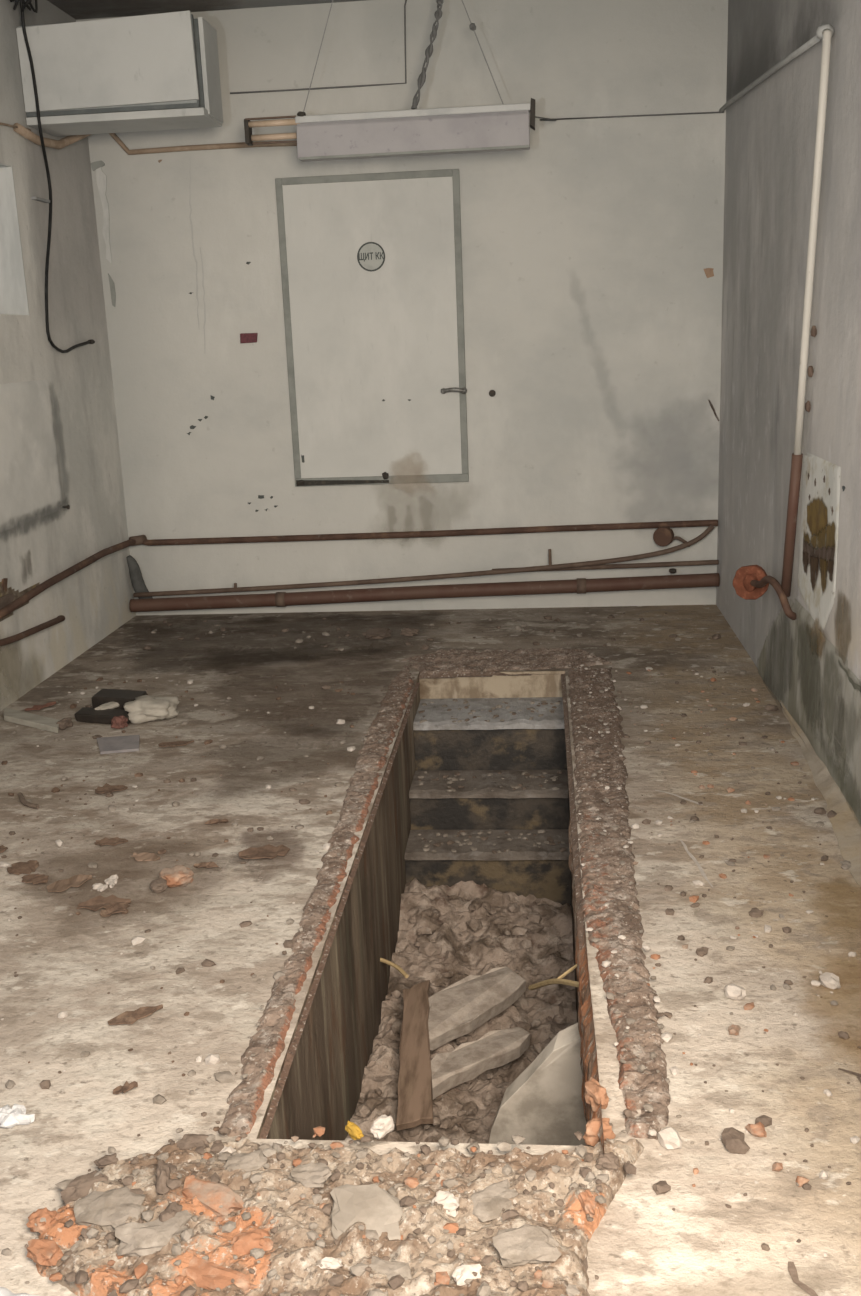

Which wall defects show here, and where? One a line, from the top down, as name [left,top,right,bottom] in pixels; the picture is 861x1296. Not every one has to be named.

leakage [835,597,850,660]
spalling [25,648,671,1296]